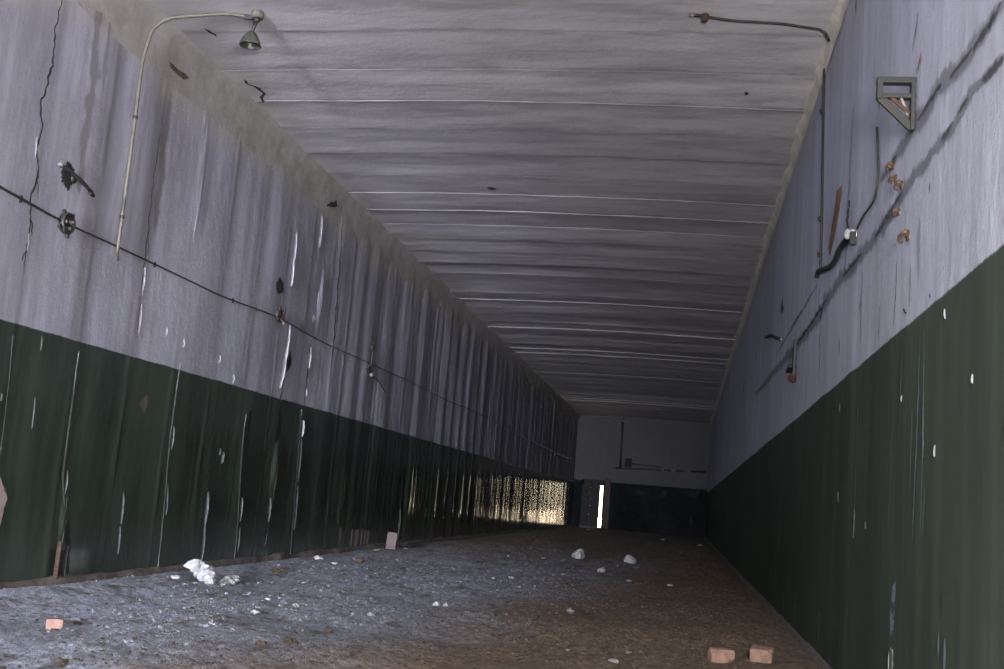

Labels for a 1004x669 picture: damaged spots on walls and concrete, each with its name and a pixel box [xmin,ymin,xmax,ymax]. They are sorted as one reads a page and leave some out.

crack [22,0,62,266]
peeling [0,337,15,524]